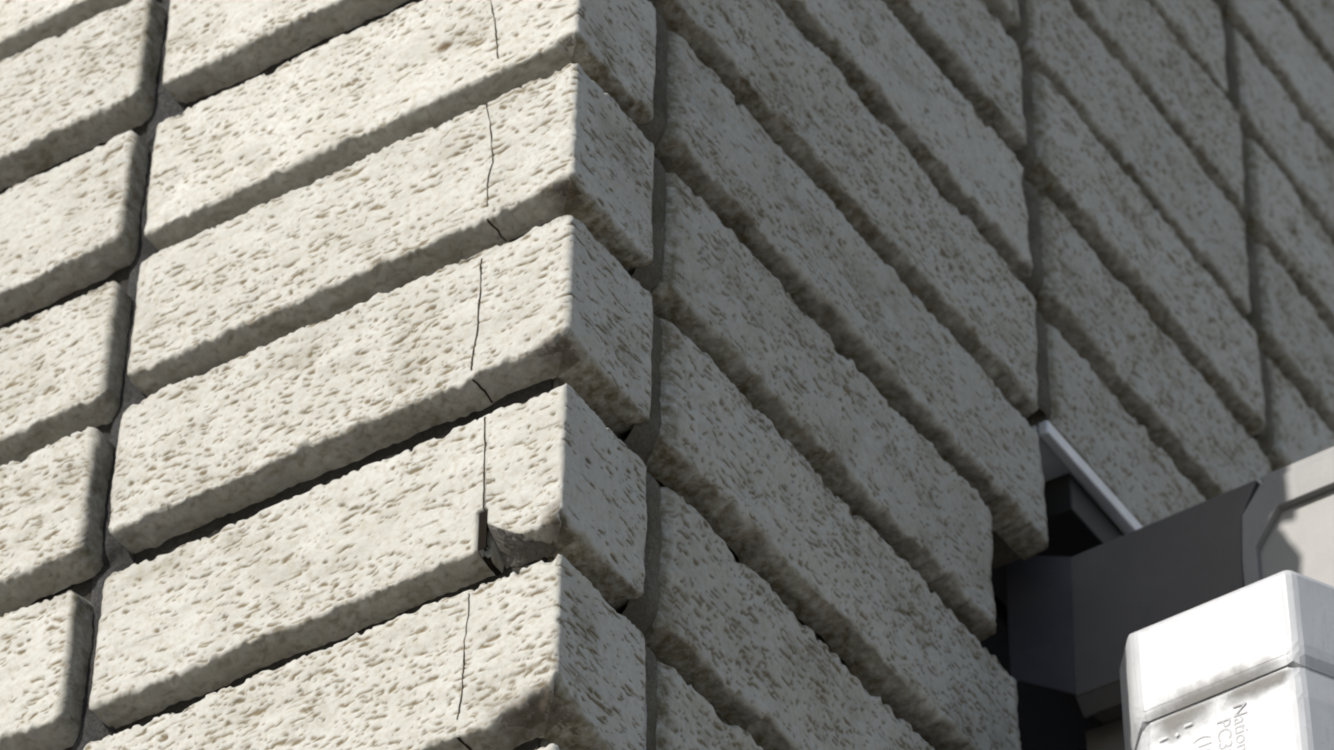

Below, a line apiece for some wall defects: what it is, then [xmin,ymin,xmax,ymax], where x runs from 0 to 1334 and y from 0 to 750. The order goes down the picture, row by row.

crack [490,0,499,58]
crack [470,104,506,511]
spalling [478,511,559,576]
crack [456,593,472,750]